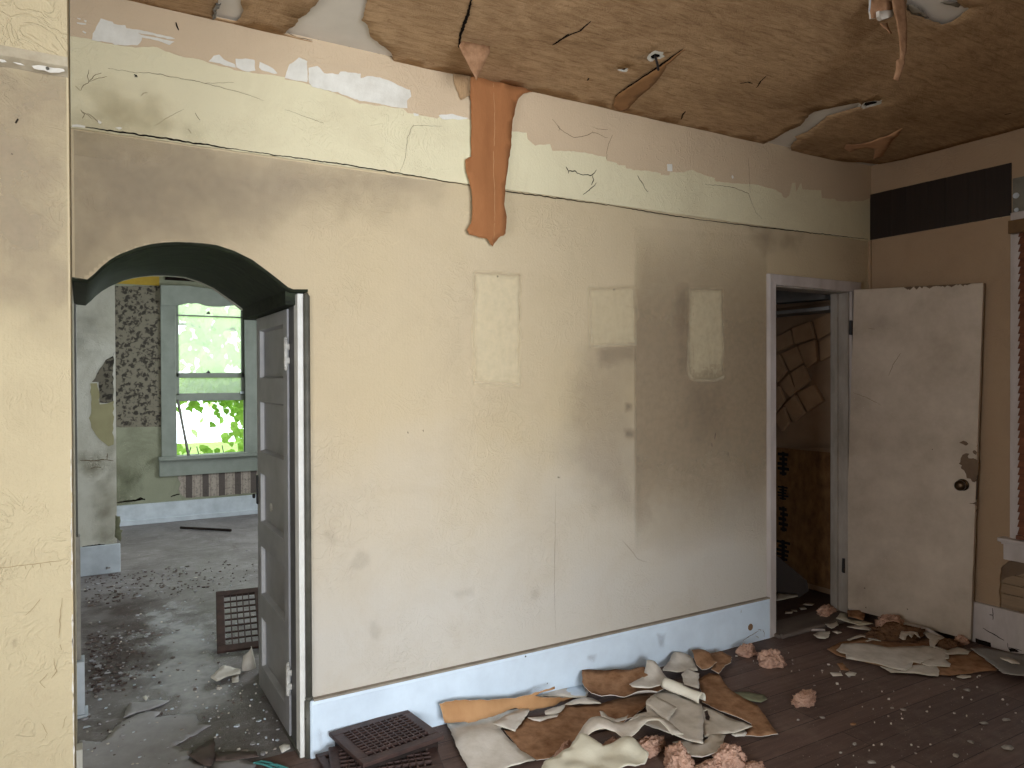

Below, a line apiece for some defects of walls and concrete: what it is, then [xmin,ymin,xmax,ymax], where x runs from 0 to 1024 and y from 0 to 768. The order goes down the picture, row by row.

peeling [70,0,471,120]
crack [458,0,472,48]
crack [80,68,470,186]
crack [505,119,863,239]
peeling [512,92,871,202]
peeling [89,383,114,446]